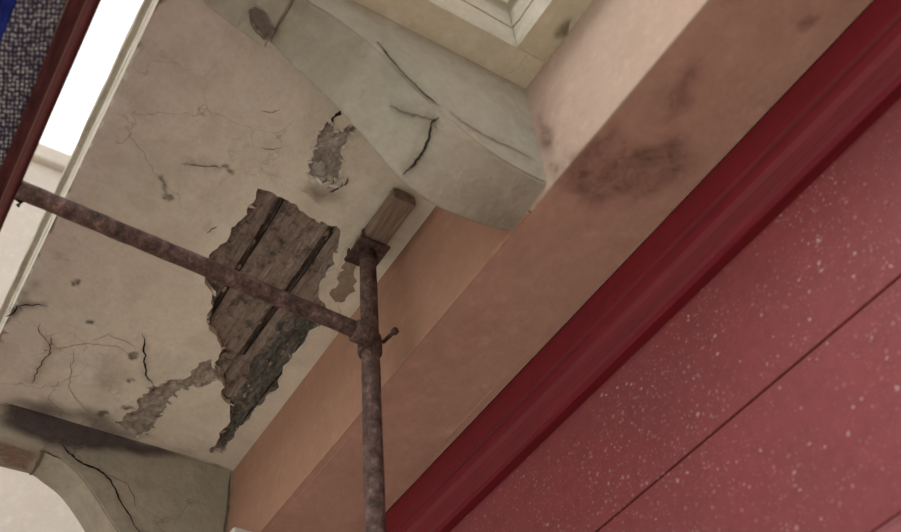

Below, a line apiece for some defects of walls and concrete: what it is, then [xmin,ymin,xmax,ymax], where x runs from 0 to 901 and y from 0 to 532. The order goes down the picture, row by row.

spalling [248,7,275,40]
spalling [306,111,356,192]
crack [378,43,533,175]
spalling [209,189,357,308]
crack [5,304,152,416]
spalling [114,278,321,453]
damp [5,404,181,454]
crack [29,444,140,532]